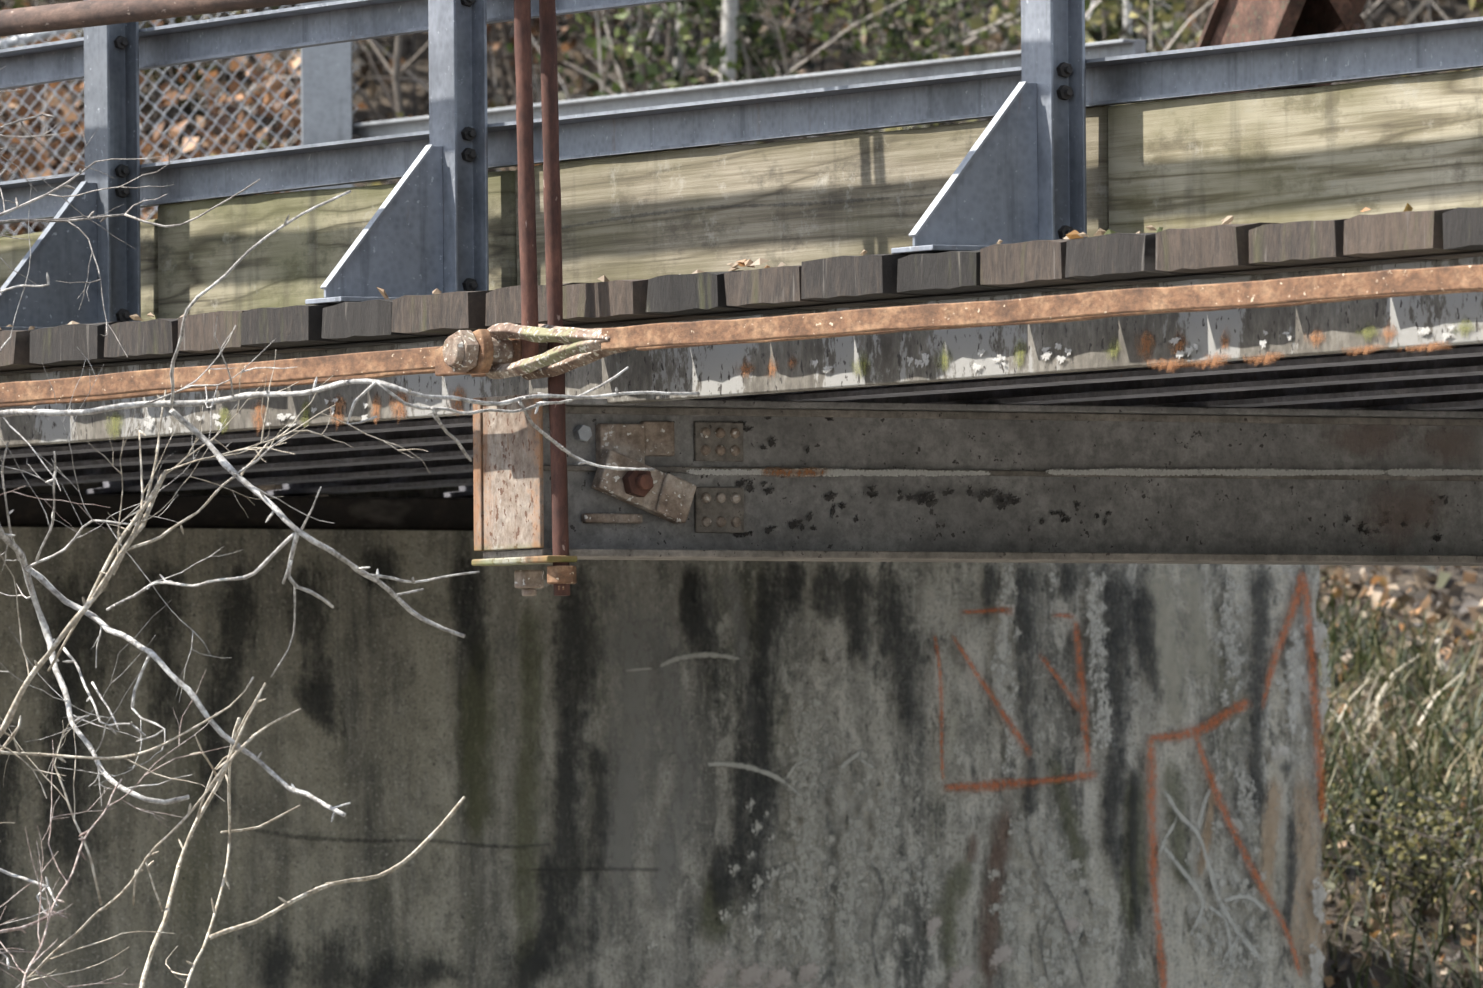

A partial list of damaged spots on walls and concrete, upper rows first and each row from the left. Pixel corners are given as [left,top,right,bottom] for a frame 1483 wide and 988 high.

peeling [973,350,1005,371]
peeling [1041,343,1071,364]
corrosion [1138,334,1229,370]
peeling [1169,337,1199,358]
corrosion [1251,353,1280,363]
corrosion [1350,326,1394,354]
peeling [1417,325,1454,341]
corrosion [452,388,464,411]
water stain [144,561,181,729]
water stain [201,560,258,809]
water stain [40,576,111,876]
water stain [0,728,21,951]